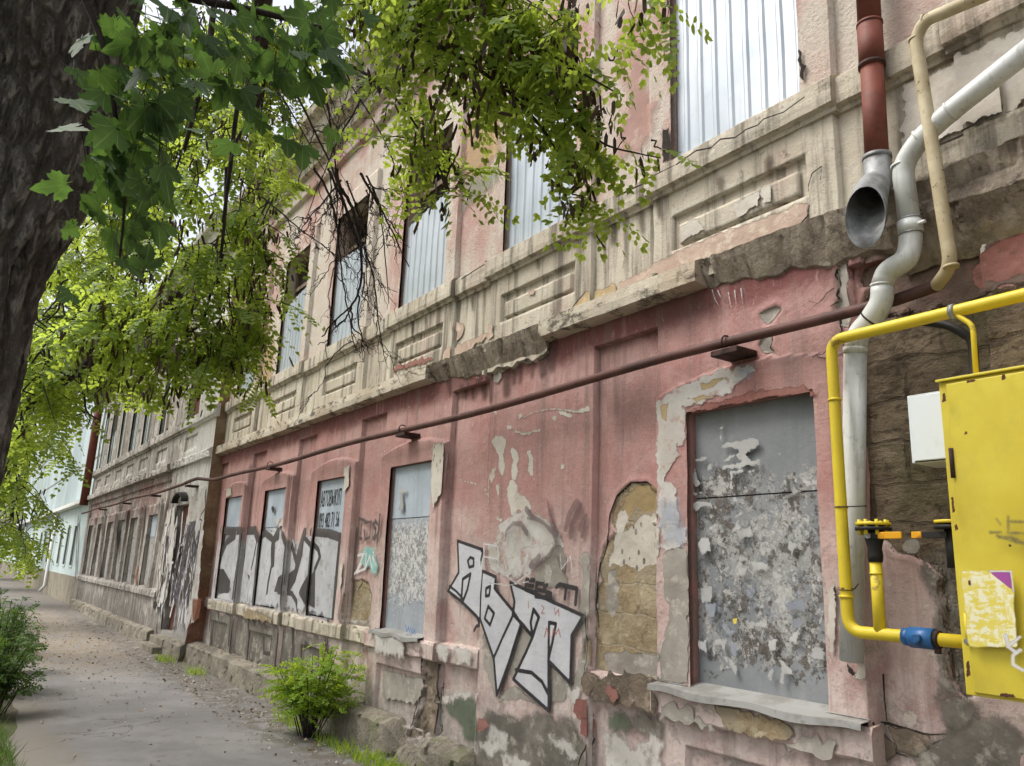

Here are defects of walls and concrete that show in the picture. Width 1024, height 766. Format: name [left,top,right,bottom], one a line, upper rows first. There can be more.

flaking render [574,203,808,306]
peeling [393,320,493,372]
water stain [447,341,556,401]
flaking render [759,306,781,324]
peeling [431,442,451,508]
flaking render [482,364,816,741]
flaking render [338,562,372,627]
flaking render [407,659,444,740]
water stain [916,695,1024,766]